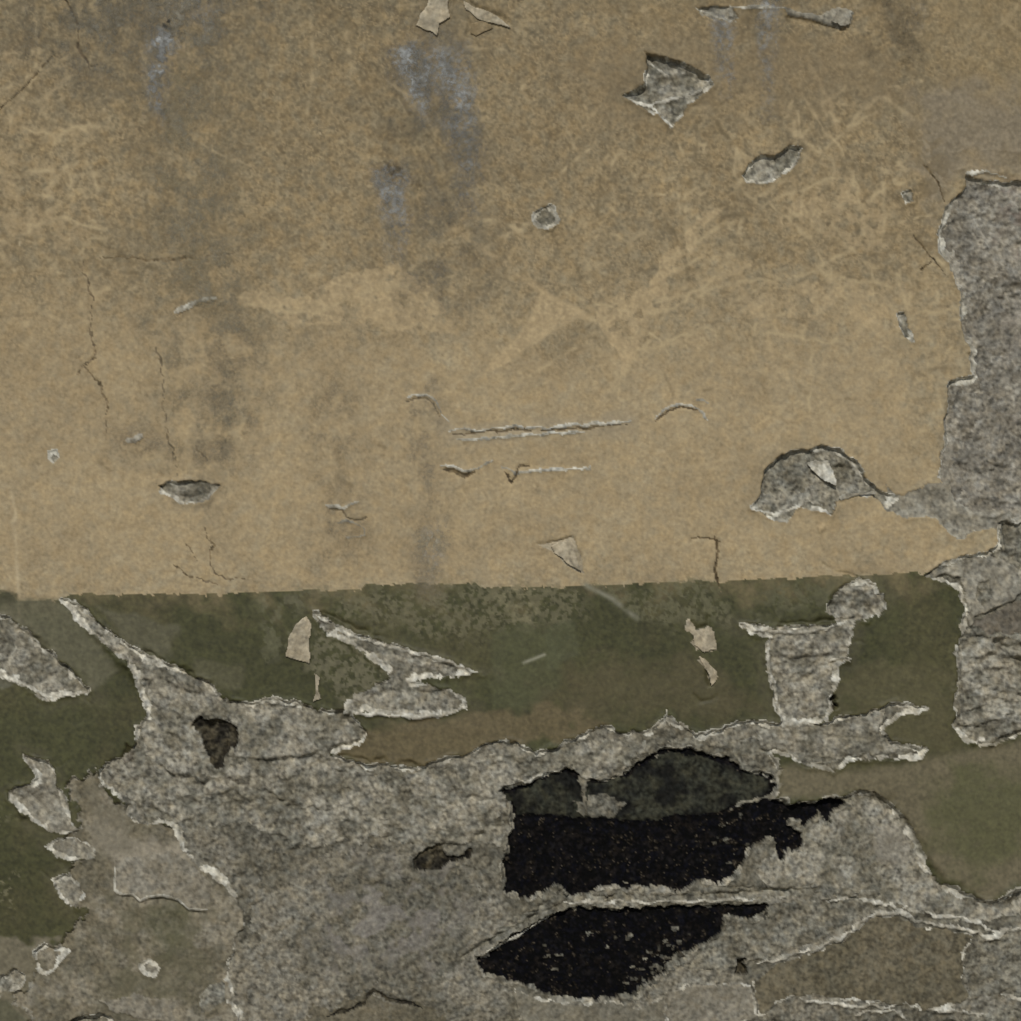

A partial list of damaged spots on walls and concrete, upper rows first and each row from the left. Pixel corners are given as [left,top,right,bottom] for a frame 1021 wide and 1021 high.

peeling [416,0,450,35]
peeling [464,1,510,36]
peeling [696,5,854,31]
water stain [394,44,473,150]
spalling [624,56,715,129]
spalling [743,146,803,185]
crack [103,255,202,263]
crack [77,357,110,413]
peeling [751,170,1021,748]
spalling [160,481,221,505]
spalling [0,577,1021,1021]